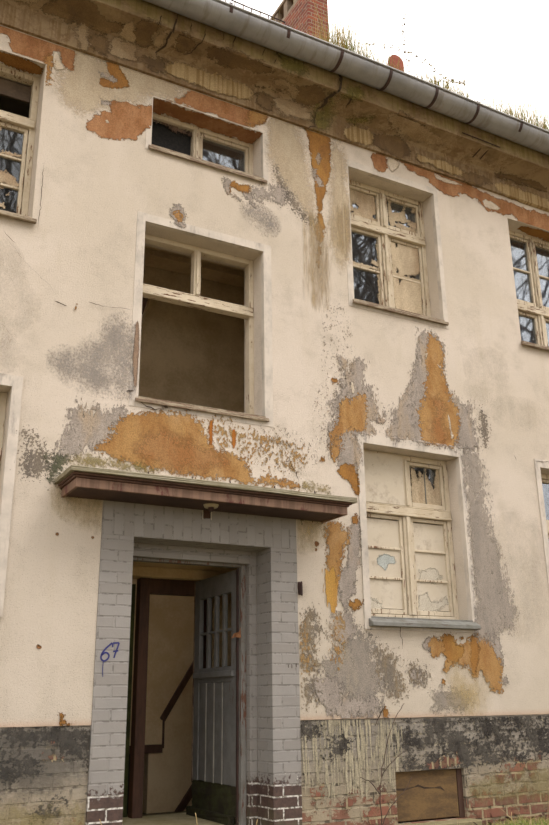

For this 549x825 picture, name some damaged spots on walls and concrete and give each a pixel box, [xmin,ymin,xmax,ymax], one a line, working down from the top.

peeling [0,0,326,128]
spalling [86,97,152,141]
damp [48,319,135,393]
spalling [54,304,520,718]
damp [301,719,403,809]